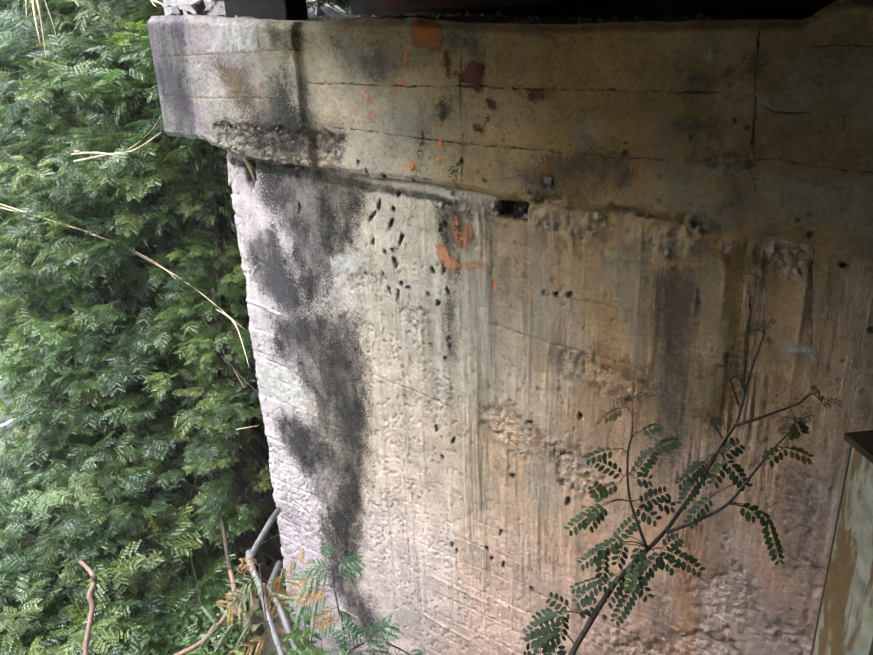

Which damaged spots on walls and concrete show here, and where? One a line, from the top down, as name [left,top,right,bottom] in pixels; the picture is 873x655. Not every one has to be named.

crack [459,52,467,184]
crack [737,29,810,163]
spalling [497,176,563,221]
damp [221,22,463,655]